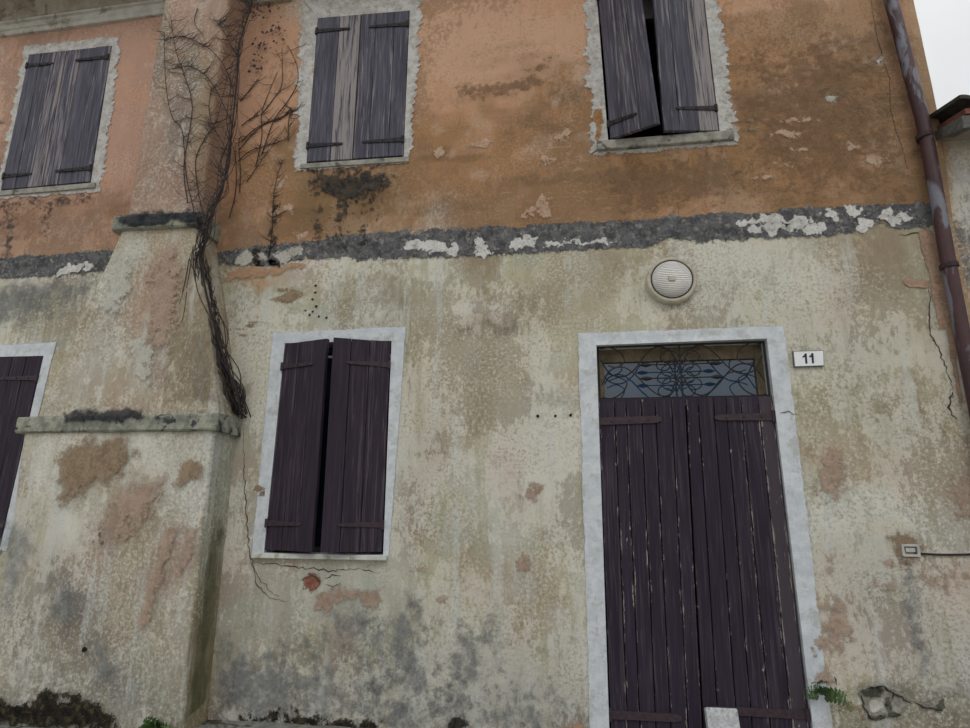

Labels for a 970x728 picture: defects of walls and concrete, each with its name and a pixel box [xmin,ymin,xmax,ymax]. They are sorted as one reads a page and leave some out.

peeling [56,261,94,278]
peeling [224,231,310,282]
leakage [305,157,395,259]
peeling [401,227,459,257]
peeling [474,237,494,259]
peeling [509,234,620,251]
peeling [736,205,912,237]
crack [928,287,957,419]
peeling [51,433,203,556]
leakage [191,530,222,713]
leakage [220,631,491,727]
spalling [858,686,946,721]